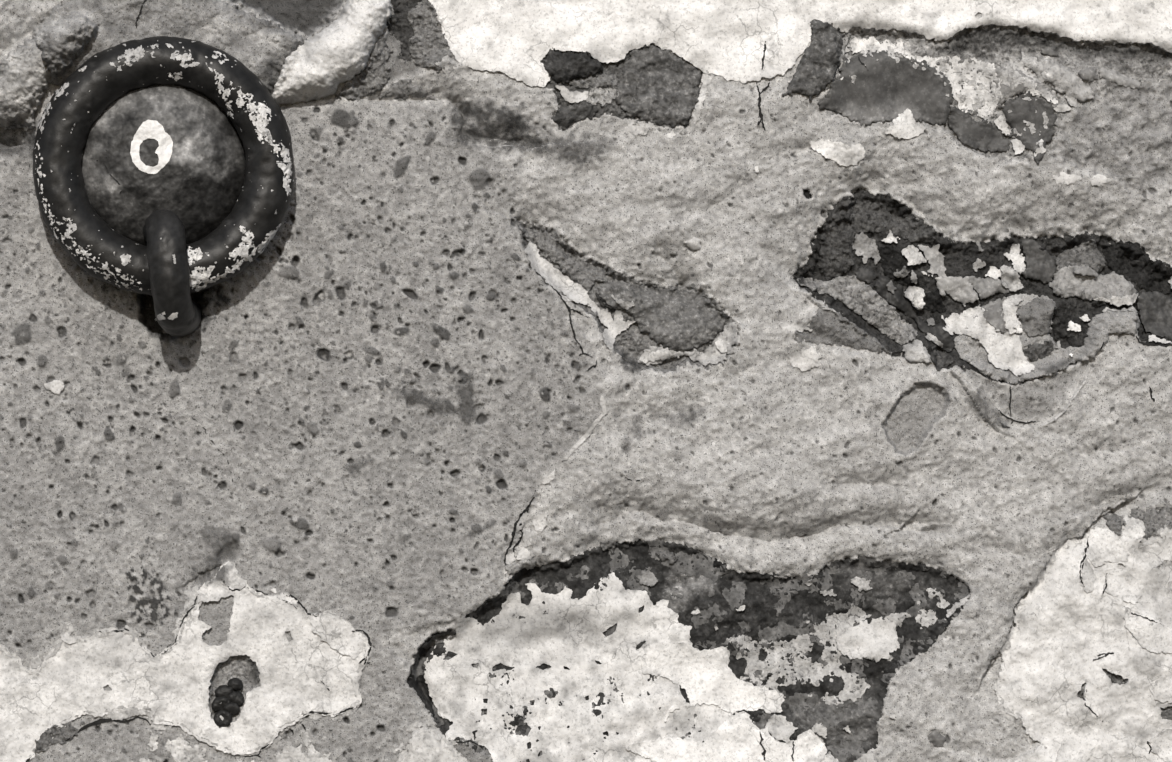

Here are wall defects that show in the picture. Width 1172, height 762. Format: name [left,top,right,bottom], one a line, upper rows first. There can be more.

peeling [335,0,1172,166]
spalling [516,219,740,373]
spalling [778,188,1172,385]
peeling [972,183,993,202]
crack [503,490,547,565]
peeling [0,558,372,762]
peeling [393,539,971,762]
peeling [994,504,1172,762]